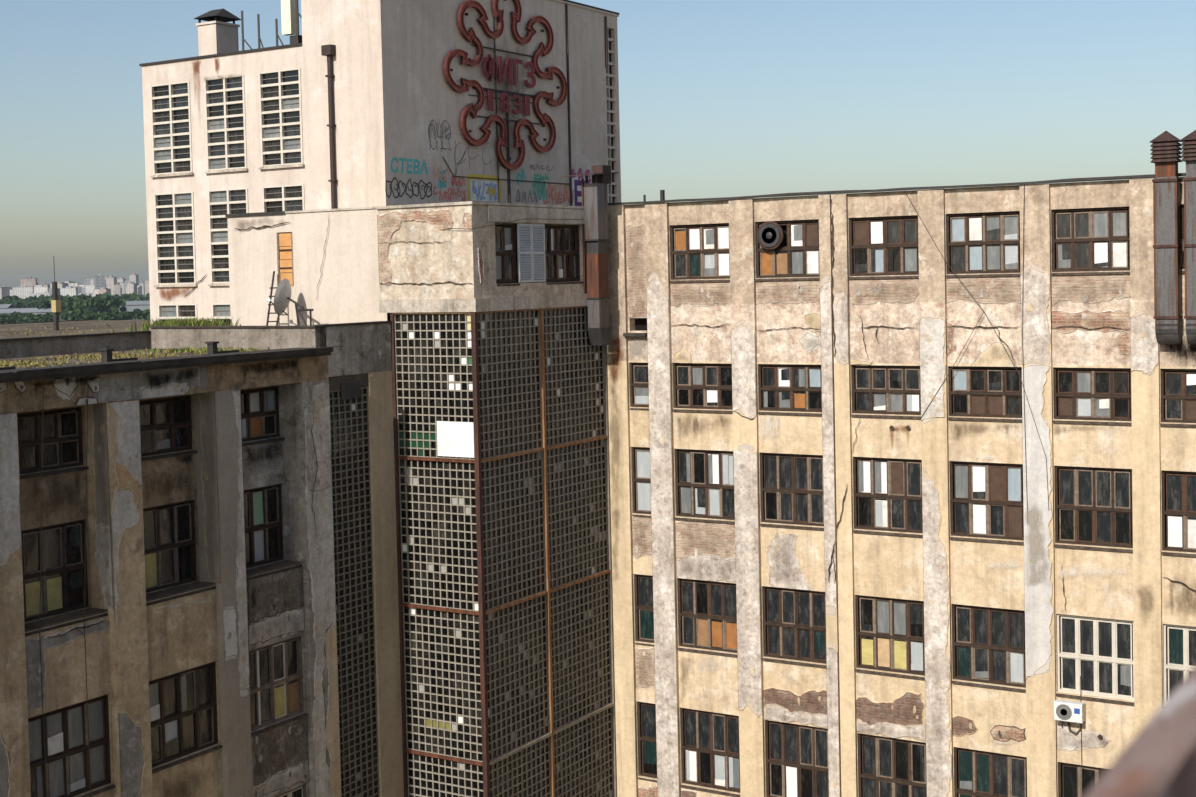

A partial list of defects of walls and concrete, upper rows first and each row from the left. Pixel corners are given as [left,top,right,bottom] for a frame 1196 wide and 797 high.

flaking render [377,209,472,285]
peeling [0,413,22,566]
peeling [25,367,201,710]
peeling [625,224,919,797]
peeling [856,468,1026,797]
peeling [919,265,1159,680]